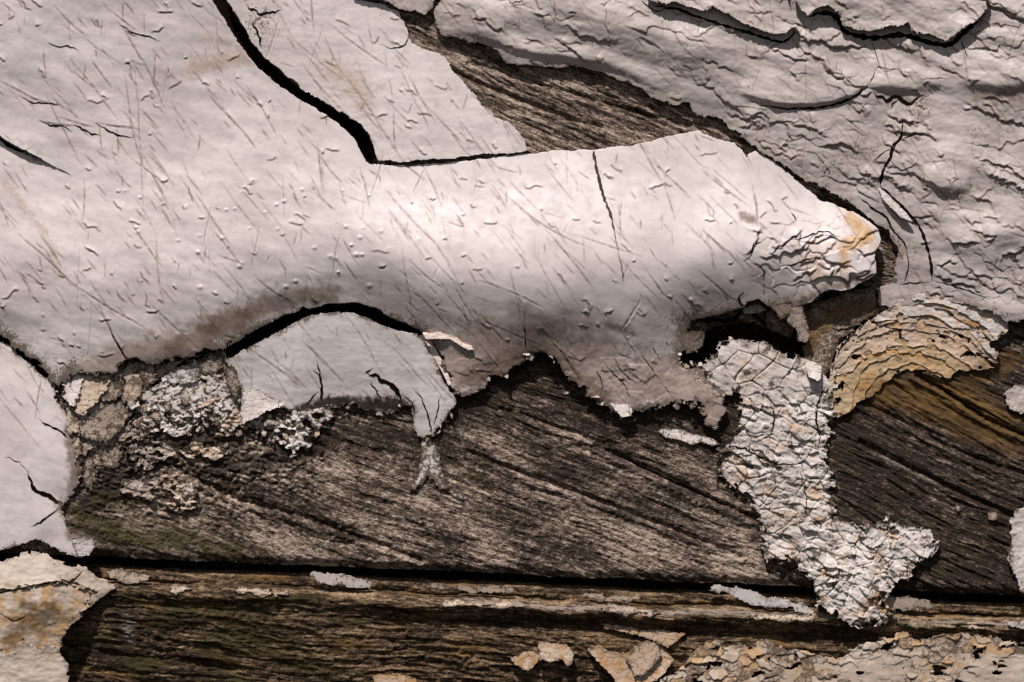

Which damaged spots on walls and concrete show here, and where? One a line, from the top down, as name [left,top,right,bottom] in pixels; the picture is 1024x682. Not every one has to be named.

crack [214,0,378,164]
crack [0,136,70,175]
crack [592,151,624,283]
crack [642,1,988,446]
crack [107,302,423,441]
peeling [62,312,474,512]
crack [557,213,836,396]
peeling [425,0,1024,682]
peeling [71,536,95,556]
peeling [107,568,150,584]
peeling [310,571,372,589]
peeling [373,673,417,682]